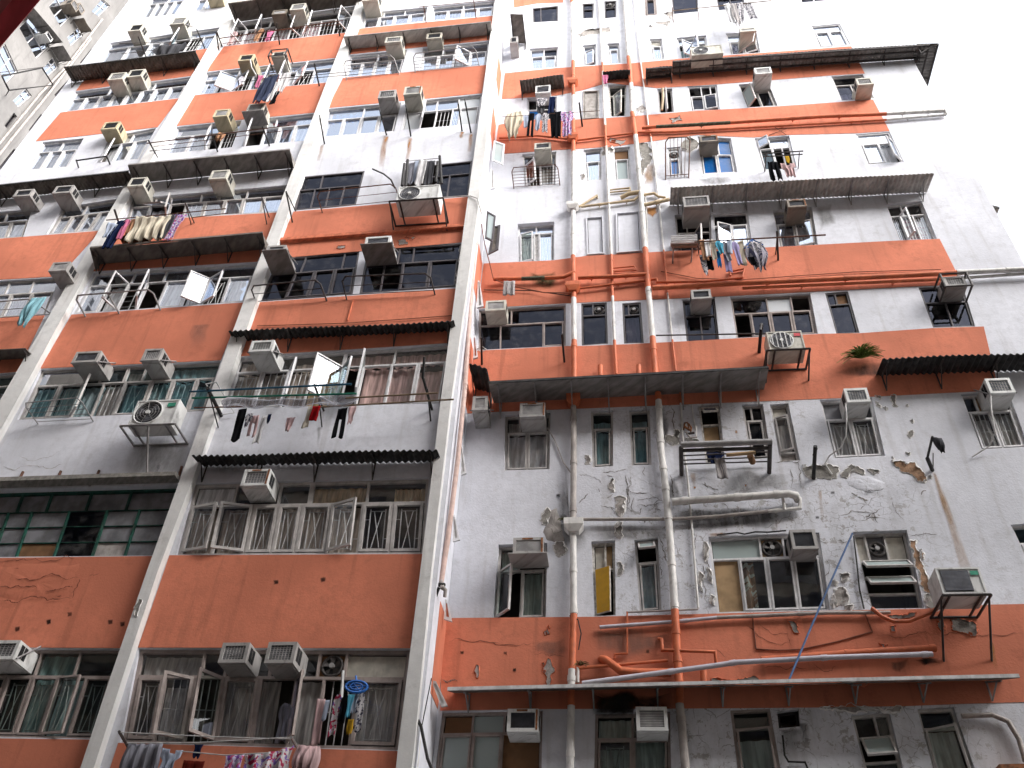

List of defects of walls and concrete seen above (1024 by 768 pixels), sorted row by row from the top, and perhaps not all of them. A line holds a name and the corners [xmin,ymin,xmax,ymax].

peeling [639,142,653,176]
spalling [875,394,933,483]
crack [579,468,673,514]
peeling [802,463,880,480]
peeling [539,507,551,526]
peeling [552,541,568,557]
peeling [697,541,717,606]
peeling [829,572,854,611]
spalling [878,539,979,647]